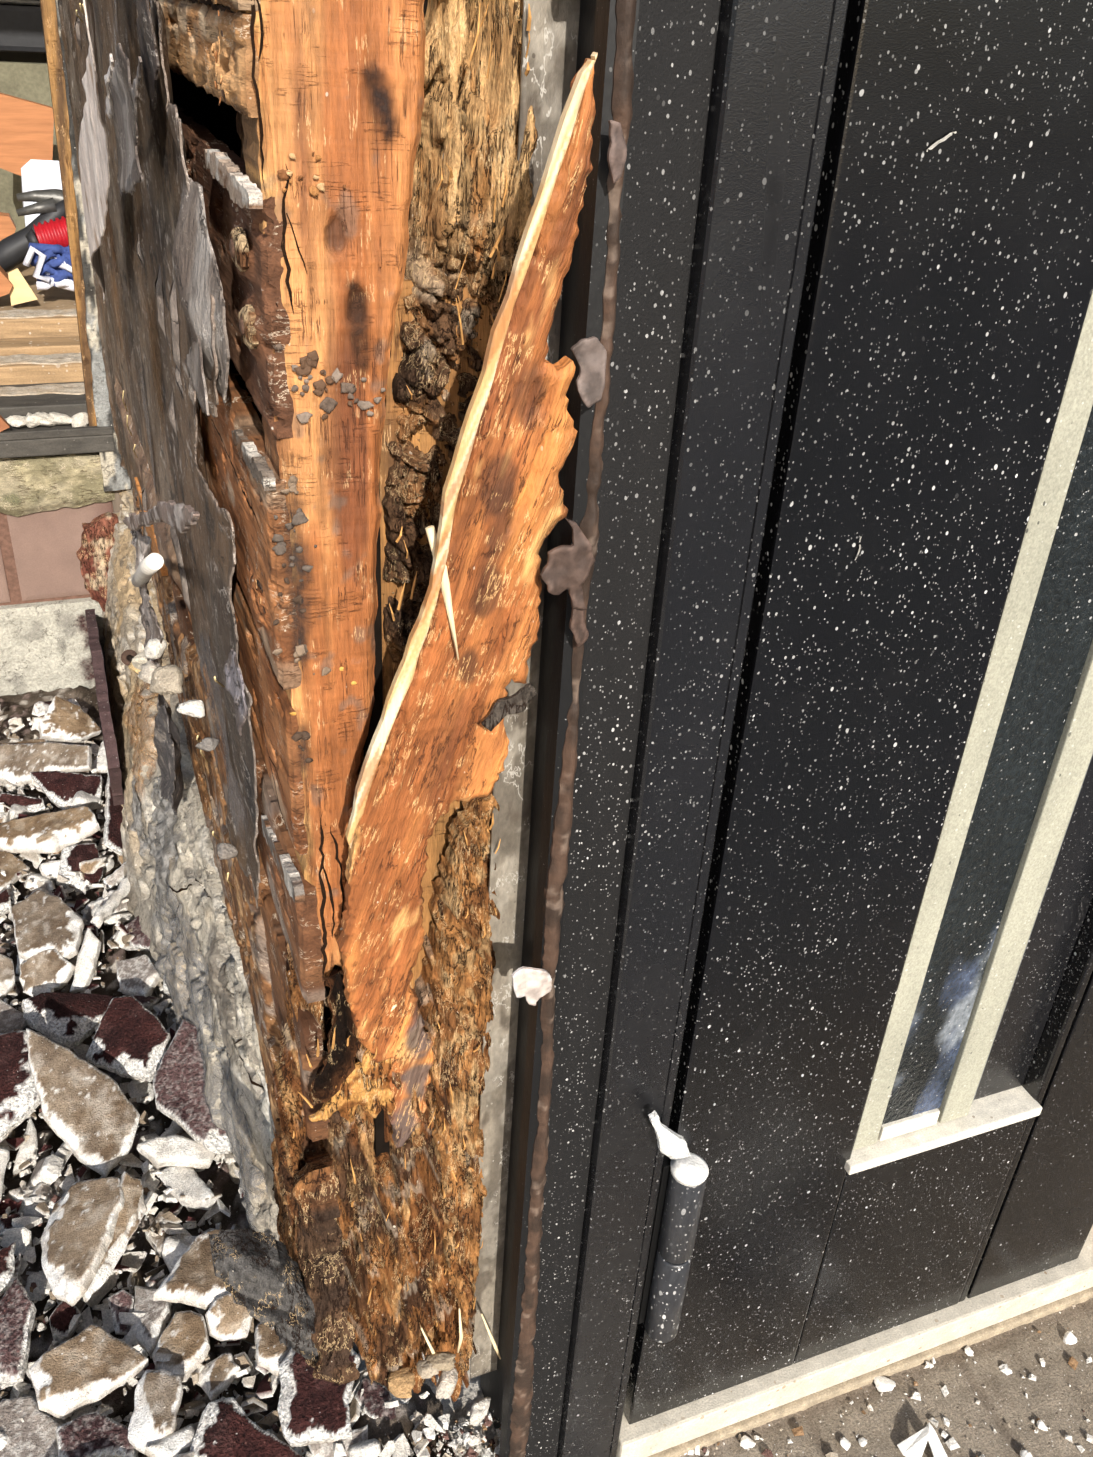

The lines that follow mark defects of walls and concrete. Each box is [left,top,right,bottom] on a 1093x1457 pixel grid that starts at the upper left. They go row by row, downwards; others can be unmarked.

crack [189,0,307,314]
peeling [277,151,325,197]
peeling [291,350,386,423]
peeling [272,475,317,625]
peeling [272,644,308,663]
peeling [290,712,313,763]
peeling [313,666,357,685]
peeling [481,683,537,731]
spalling [205,938,238,1056]
spalling [308,969,361,1104]